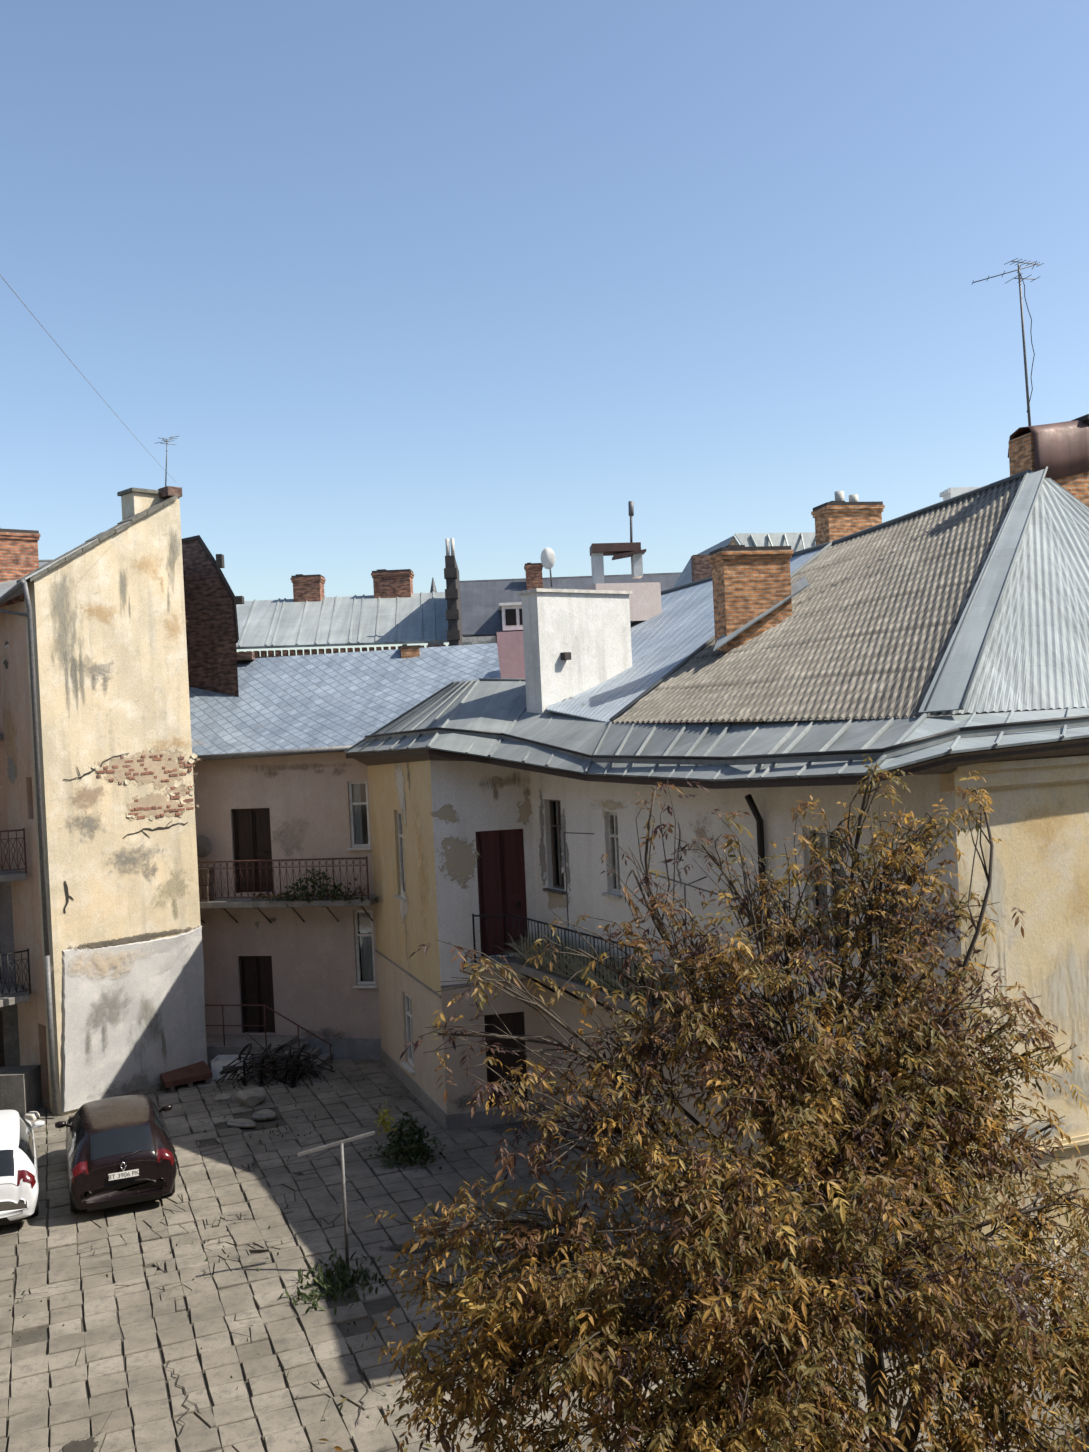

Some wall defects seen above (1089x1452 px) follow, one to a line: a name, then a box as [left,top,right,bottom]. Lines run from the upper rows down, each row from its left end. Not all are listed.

water stain [89,574,131,617]
water stain [54,579,107,700]
flaking render [86,747,202,821]
flaking render [430,805,480,888]
water stain [73,951,166,1097]
water stain [1034,949,1089,1103]
water stain [1003,1120,1064,1145]